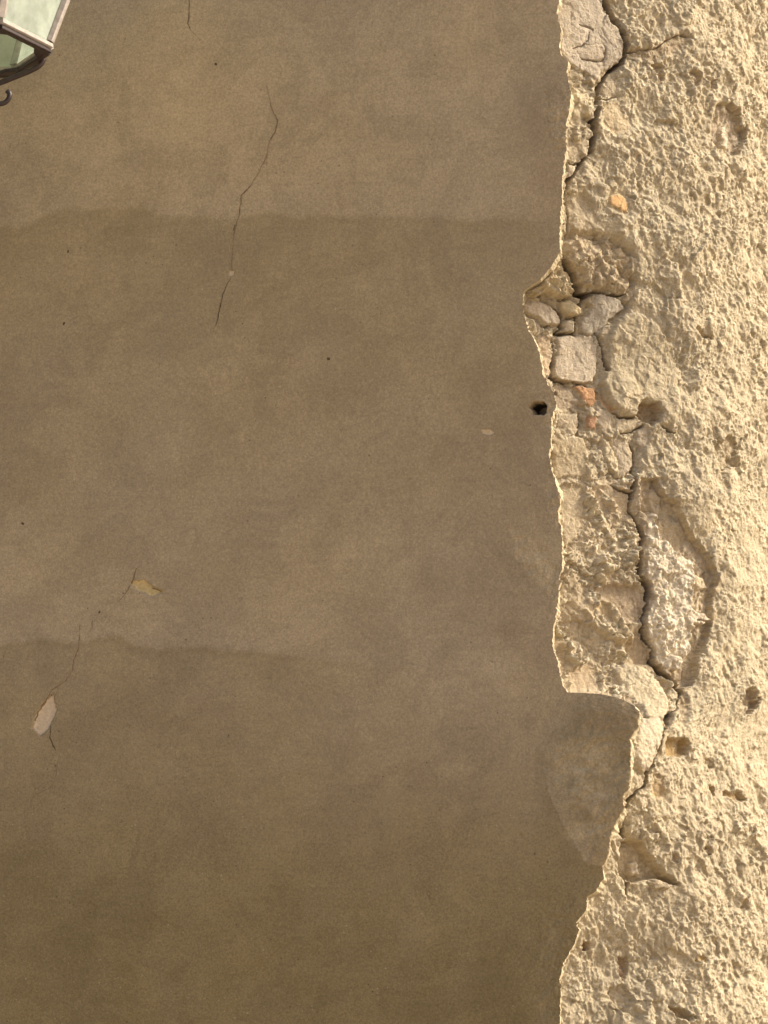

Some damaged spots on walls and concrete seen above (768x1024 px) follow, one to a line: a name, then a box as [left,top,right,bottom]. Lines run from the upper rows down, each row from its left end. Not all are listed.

crack [214,85,278,329]
crack [548,0,692,395]
spalling [523,0,720,774]
peeling [34,696,57,735]
crack [610,411,683,839]
crack [621,877,630,895]
spalling [617,839,676,890]